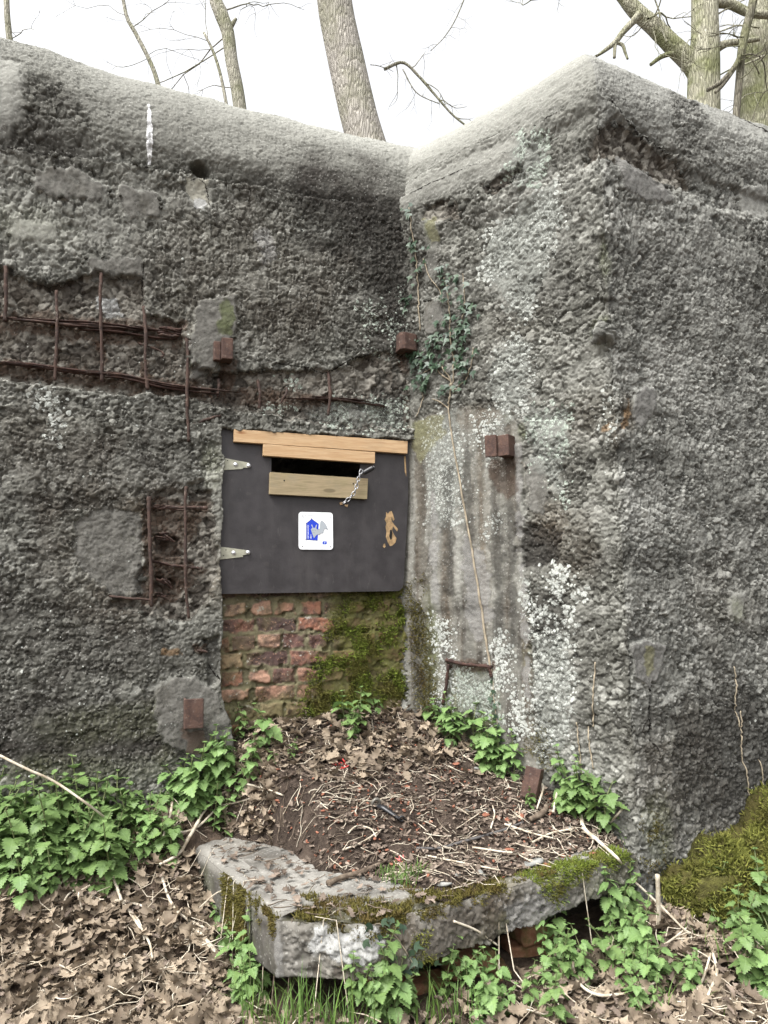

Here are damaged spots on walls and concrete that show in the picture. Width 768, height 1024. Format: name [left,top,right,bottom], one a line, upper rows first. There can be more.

spalling [185,176,210,209]
spalling [0,255,411,442]
spalling [68,486,219,622]